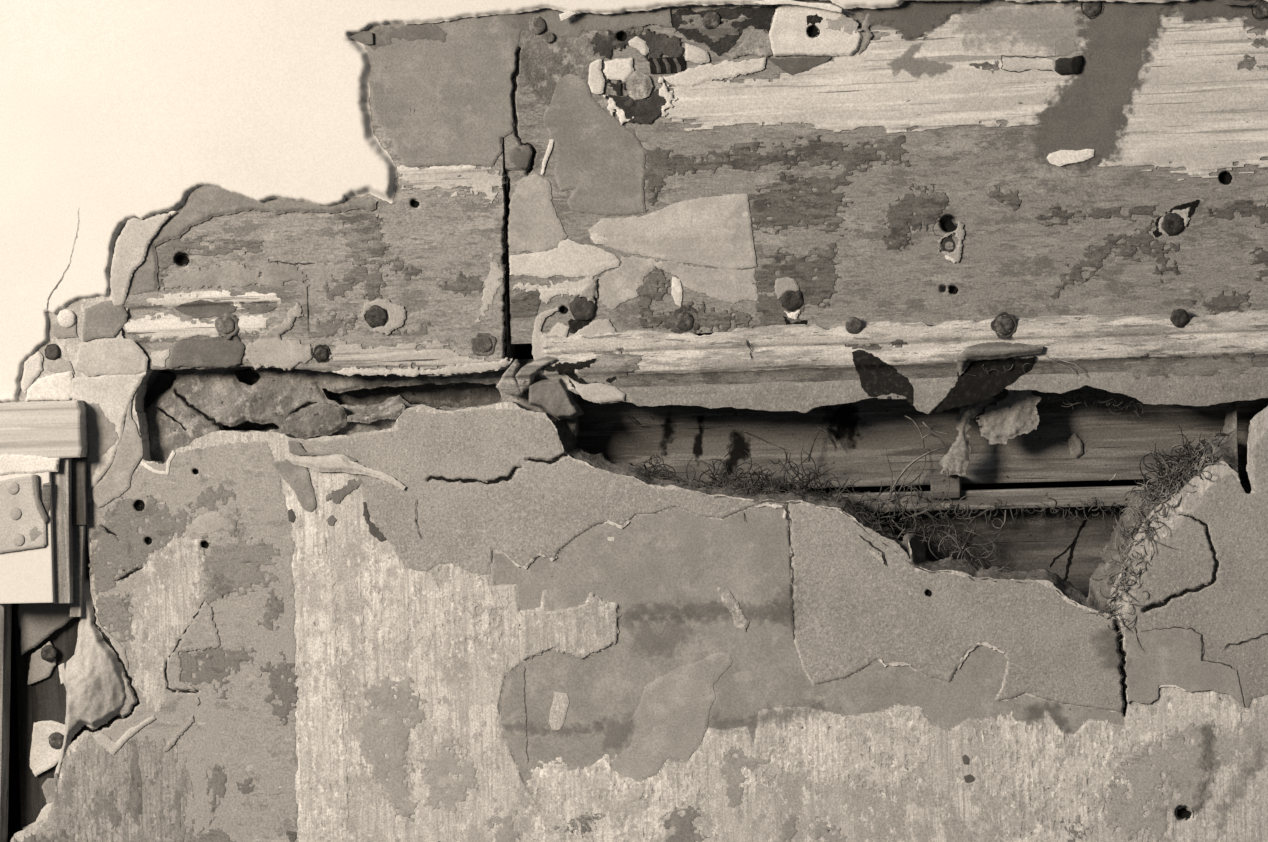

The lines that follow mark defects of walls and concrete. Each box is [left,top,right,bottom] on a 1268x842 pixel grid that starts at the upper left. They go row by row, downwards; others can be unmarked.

flaking render [350,24,447,50]
peeling [1047,0,1268,181]
peeling [396,165,511,204]
peeling [497,0,1090,333]
peeling [1208,200,1268,232]
peeling [1190,247,1268,315]
flaking render [0,454,60,476]
crack [414,453,568,539]
flaking render [17,183,1258,842]
crack [785,505,795,639]
crack [1115,514,1268,716]